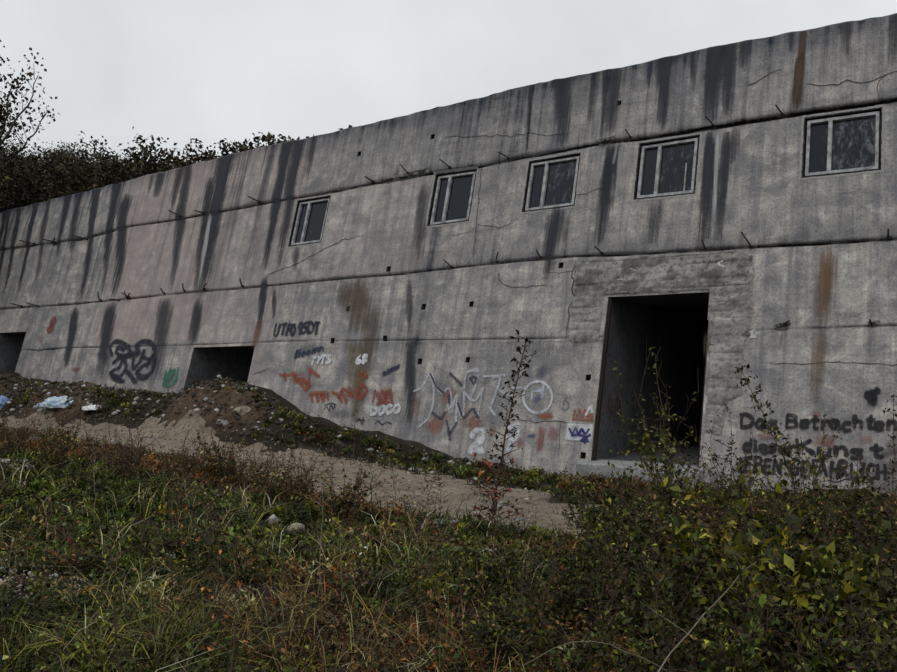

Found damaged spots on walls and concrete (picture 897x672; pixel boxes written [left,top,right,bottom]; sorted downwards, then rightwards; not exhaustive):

damp [656,56,672,127]
damp [690,41,748,120]
corrosion [793,31,806,108]
crack [807,71,897,100]
damp [57,183,132,372]
damp [172,165,191,282]
damp [189,154,234,344]
damp [264,136,316,265]
damp [594,143,621,244]
damp [699,131,737,238]
corrosion [818,253,833,317]
crack [771,359,897,367]